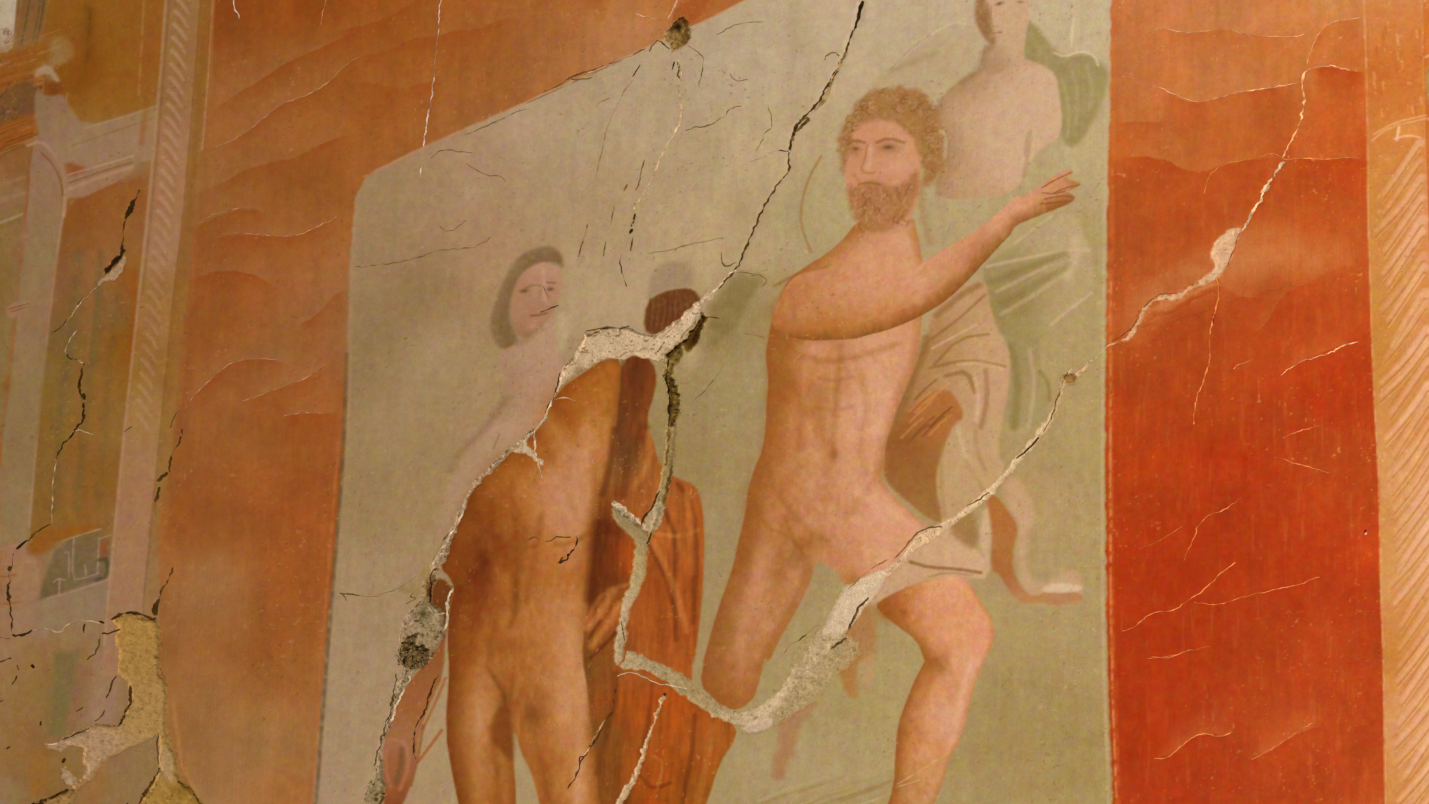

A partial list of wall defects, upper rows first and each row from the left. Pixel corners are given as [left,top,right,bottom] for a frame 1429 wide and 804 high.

crack [200,208,336,237]
crack [356,220,490,267]
crack [431,109,524,182]
crack [578,1,864,293]
crack [1060,18,1362,424]
crack [0,190,173,702]
crack [154,358,325,515]
crack [340,373,562,804]
peeling [32,611,205,804]